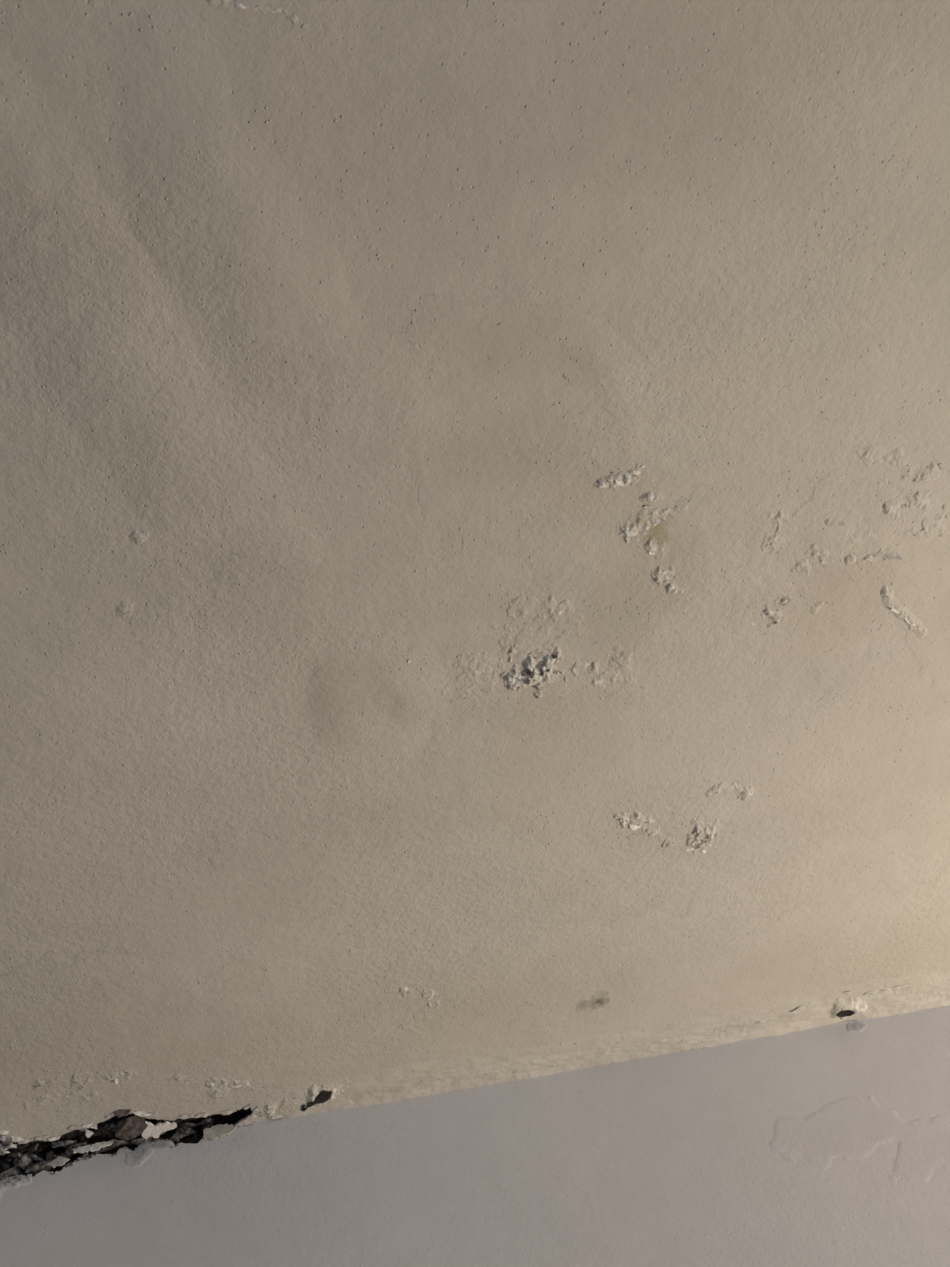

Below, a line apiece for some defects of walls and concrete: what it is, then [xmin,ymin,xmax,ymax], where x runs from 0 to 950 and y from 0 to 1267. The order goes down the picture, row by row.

peeling [592,464,688,602]
peeling [500,637,637,699]
peeling [611,807,726,855]
spalling [0,974,950,1180]